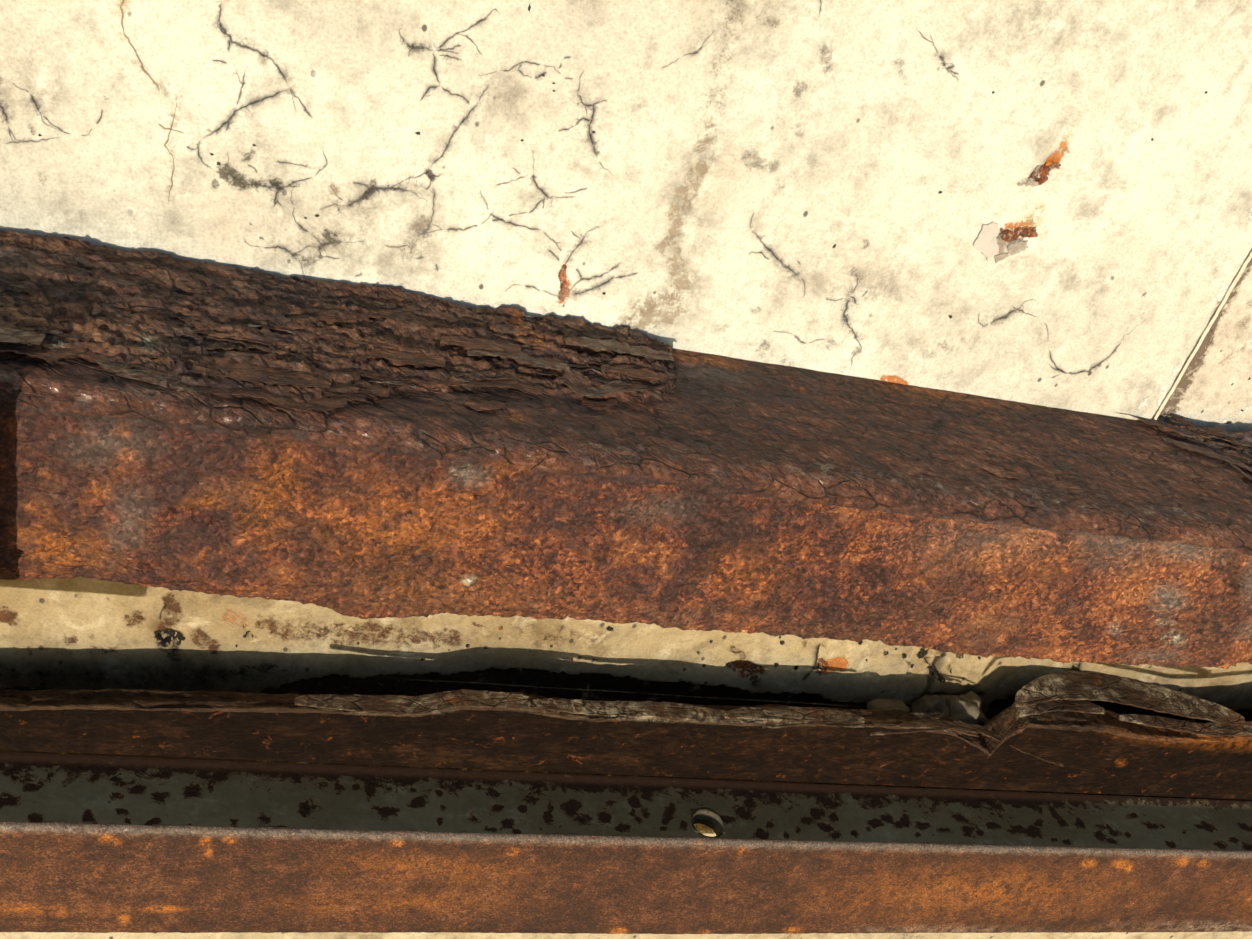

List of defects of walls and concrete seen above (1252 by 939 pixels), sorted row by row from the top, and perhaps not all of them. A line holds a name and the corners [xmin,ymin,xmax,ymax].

crack [0,86,102,144]
crack [120,0,637,306]
spalling [1017,141,1069,187]
spalling [973,207,1041,263]
corrosion [0,606,18,626]
corrosion [125,611,144,627]
corrosion [158,594,182,630]
corrosion [192,629,221,654]
corrosion [222,610,460,646]
corrosion [727,646,765,686]
corrosion [816,657,848,675]
spalling [884,647,981,684]